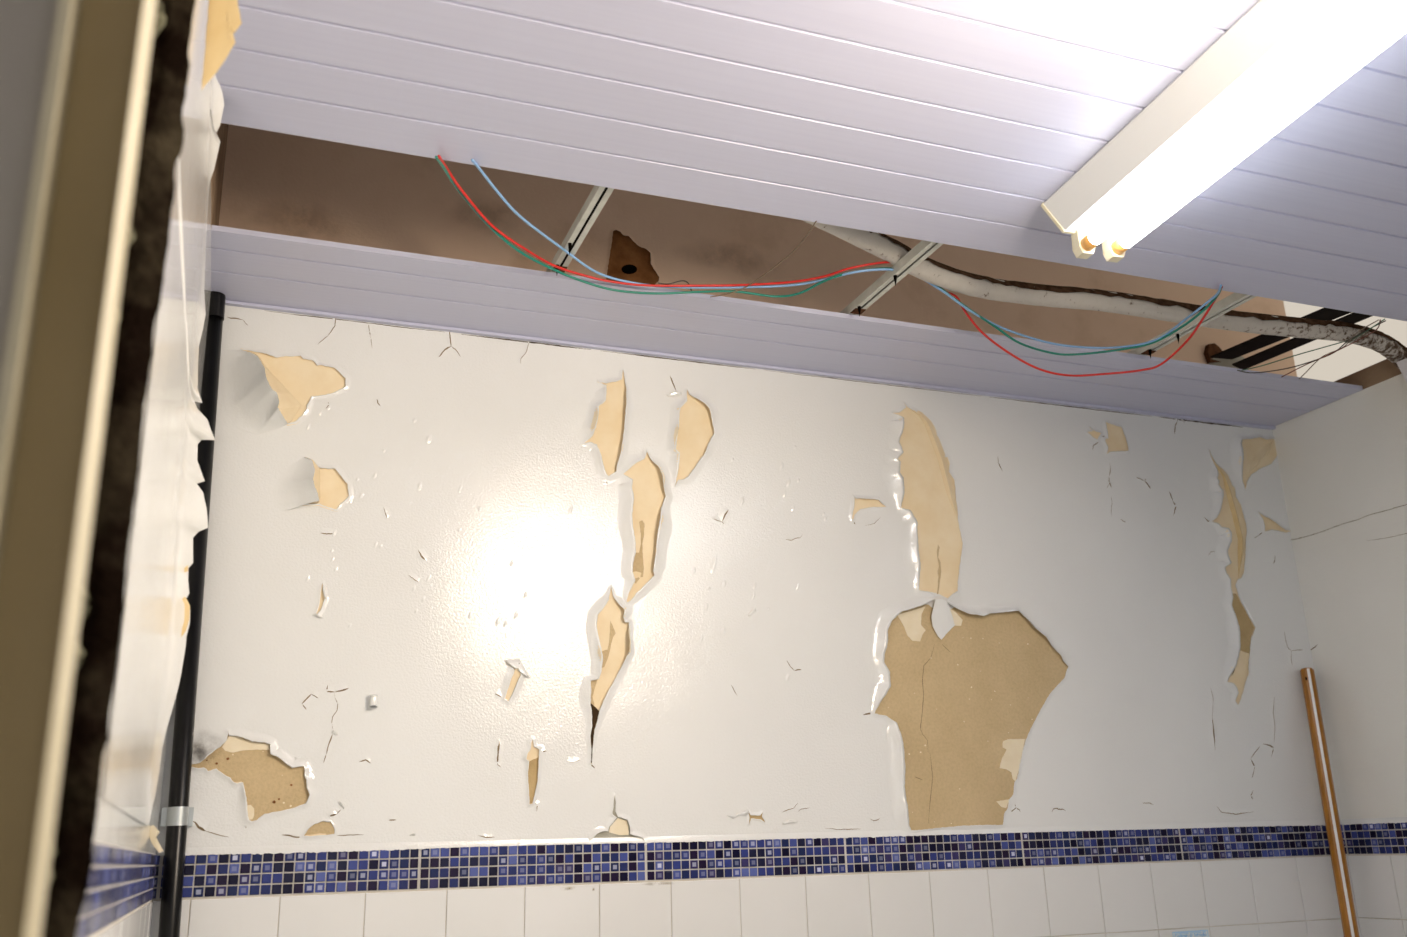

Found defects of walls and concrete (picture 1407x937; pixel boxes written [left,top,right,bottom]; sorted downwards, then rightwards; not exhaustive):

peeling [221,347,352,434]
peeling [41,0,242,937]
peeling [273,456,355,514]
peeling [311,580,330,618]
peeling [579,366,723,765]
peeling [848,400,1073,833]
peeling [1207,432,1291,709]
peeling [191,728,345,841]
peeling [520,735,544,809]